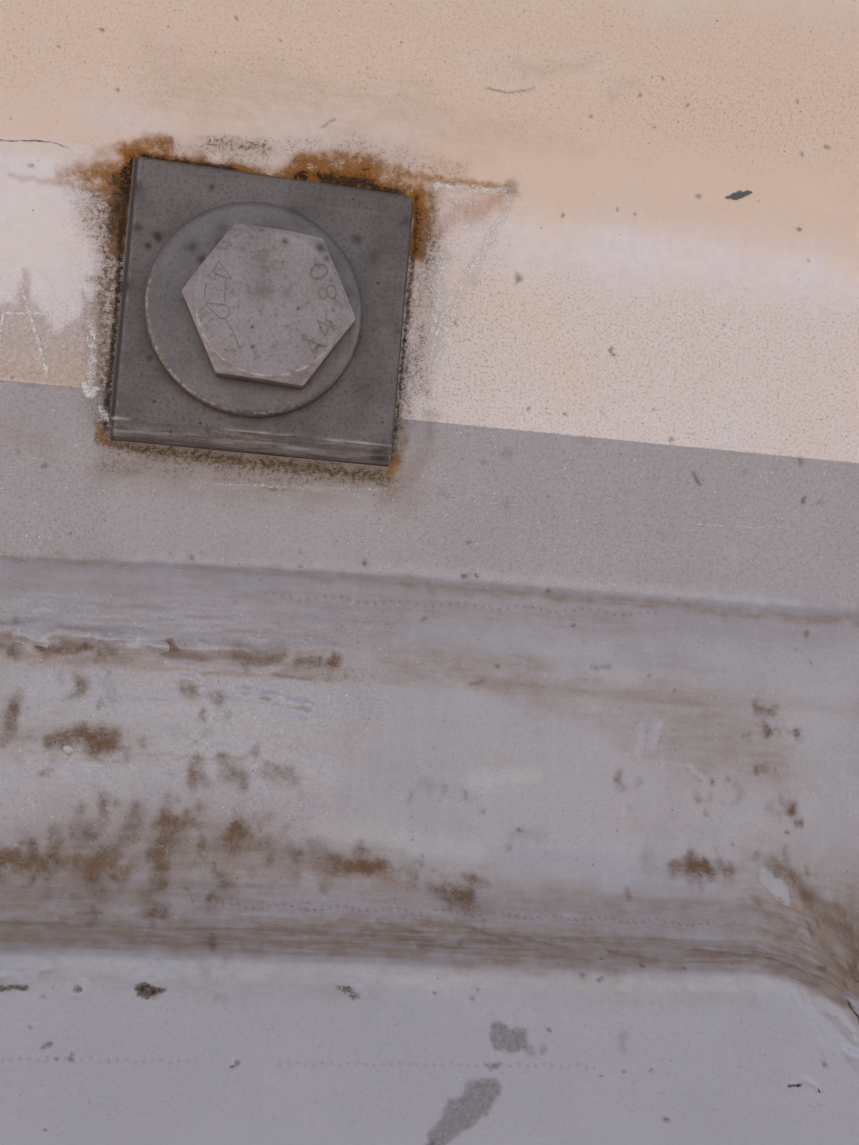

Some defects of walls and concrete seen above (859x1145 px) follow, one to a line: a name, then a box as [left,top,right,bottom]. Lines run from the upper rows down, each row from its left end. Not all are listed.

rust [74,135,503,490]
rust [35,643,112,655]
rust [45,724,117,756]
rust [0,804,140,896]
rust [148,814,189,918]
rust [222,821,246,852]
rust [334,848,388,876]
rust [435,875,476,910]